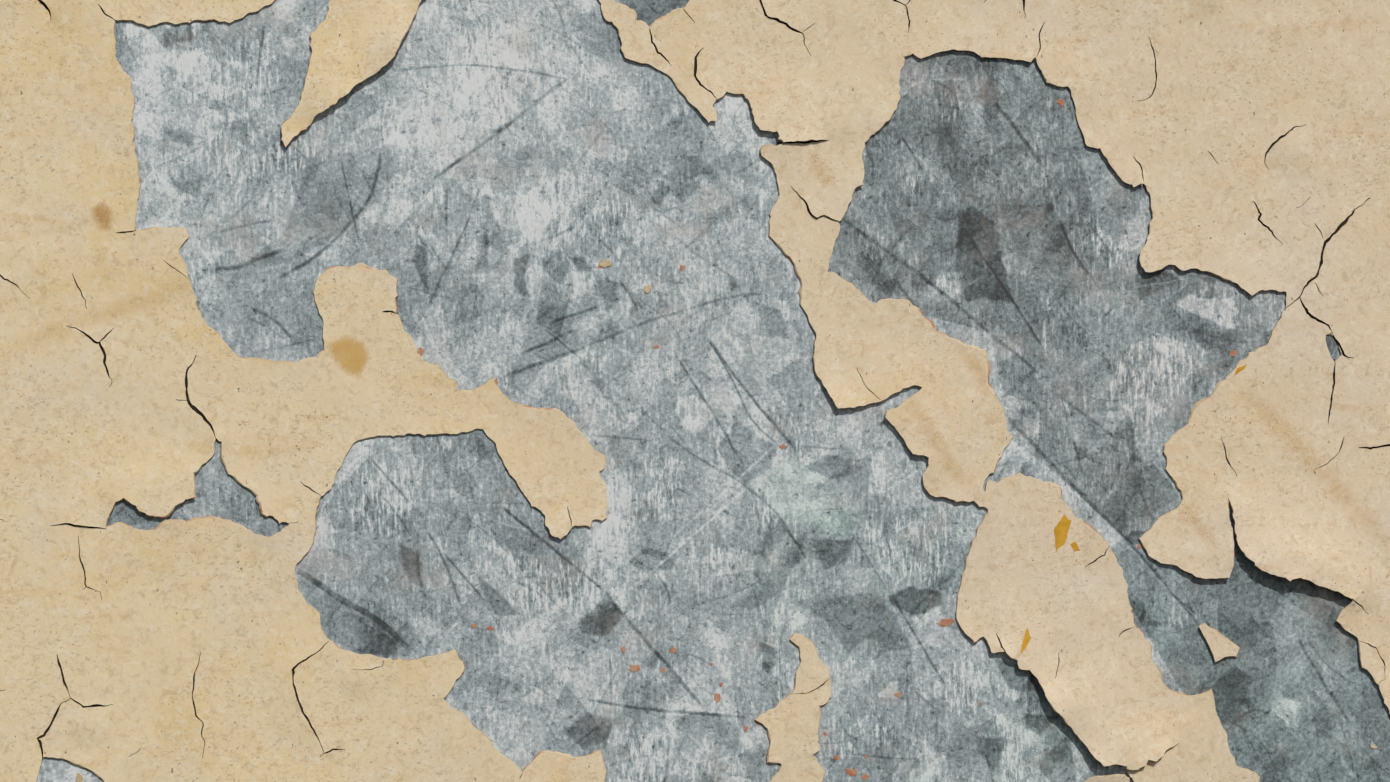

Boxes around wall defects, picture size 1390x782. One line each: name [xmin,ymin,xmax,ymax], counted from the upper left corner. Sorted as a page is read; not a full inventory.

crack [893,0,910,32]
crack [1253,201,1283,245]
crack [66,274,114,386]
peeling [51,356,297,556]
peeling [98,0,1182,782]
peeling [793,20,1390,782]
peeling [36,655,120,782]